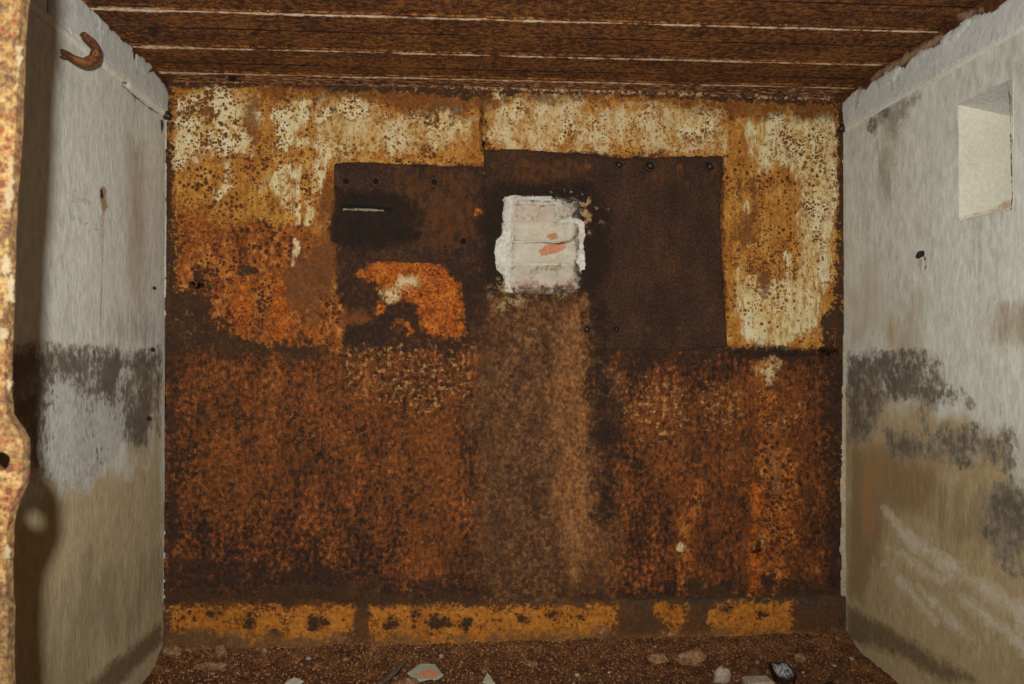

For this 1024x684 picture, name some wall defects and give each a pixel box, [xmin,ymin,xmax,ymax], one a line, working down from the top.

flaking render [539,233,565,255]
rust [133,0,1007,639]
water stain [0,452,10,469]
water stain [12,342,162,481]
water stain [845,348,1024,683]